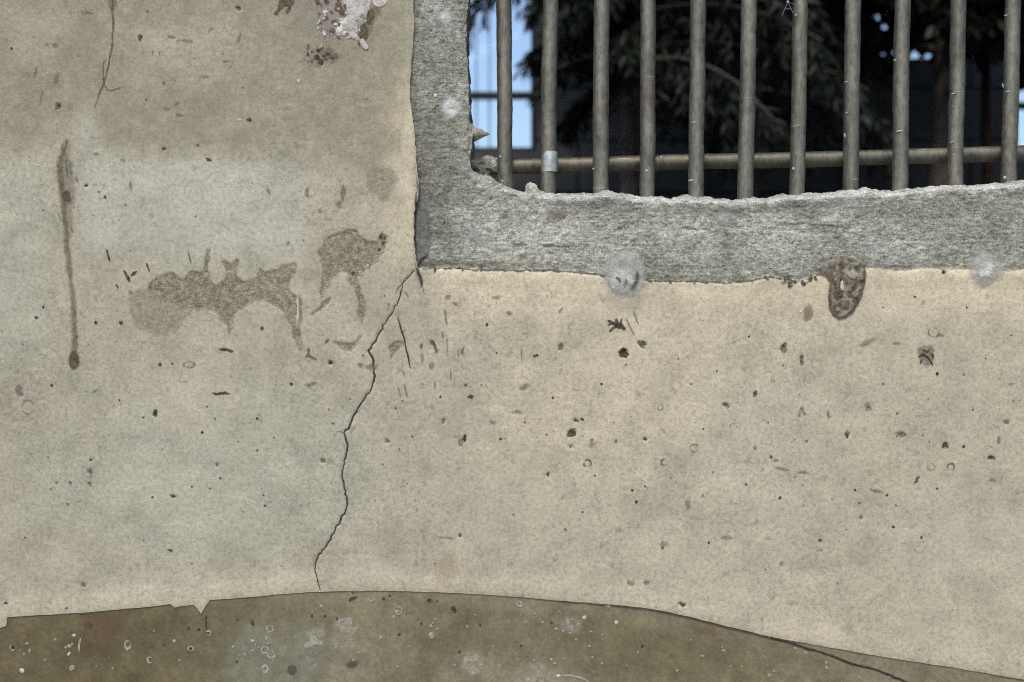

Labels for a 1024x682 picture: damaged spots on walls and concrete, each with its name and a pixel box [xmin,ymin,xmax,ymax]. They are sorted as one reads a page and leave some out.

spalling [306,0,387,65]
water stain [58,144,79,369]
flaking render [116,229,388,364]
crack [314,192,427,591]